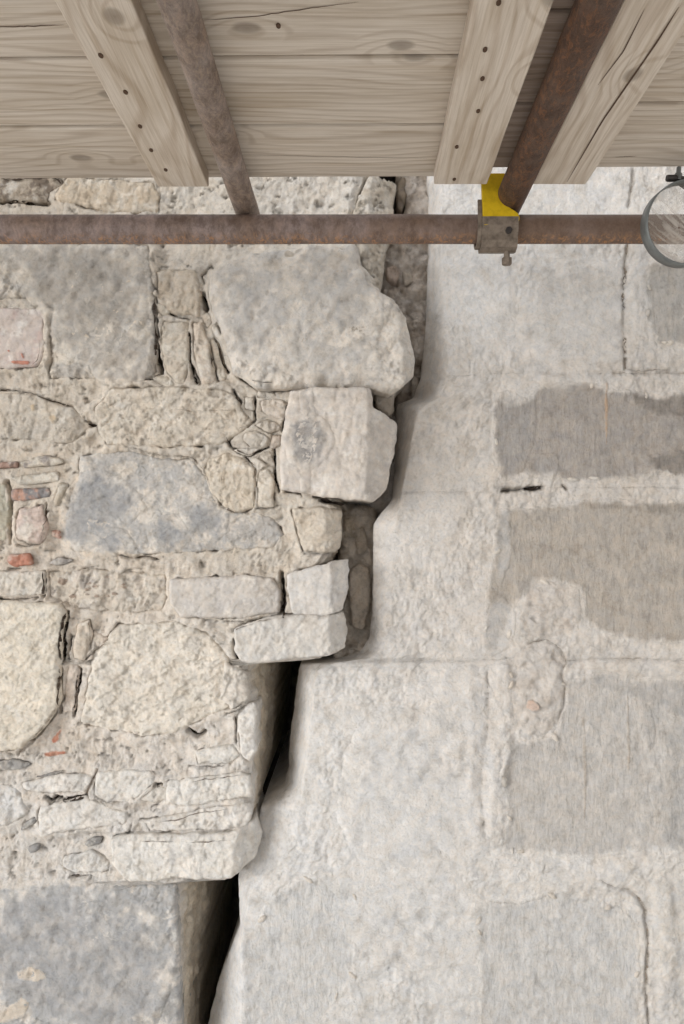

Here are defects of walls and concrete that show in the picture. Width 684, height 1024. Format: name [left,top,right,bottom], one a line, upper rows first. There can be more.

crack [356,157,428,214]
crack [381,244,429,422]
crack [150,296,288,513]
crack [227,573,286,659]
crack [321,448,395,658]
damp [481,508,517,657]
damp [491,389,559,480]
damp [587,498,684,518]
damp [624,389,684,418]
damp [646,449,684,477]
crack [263,660,302,797]
crack [231,873,240,939]